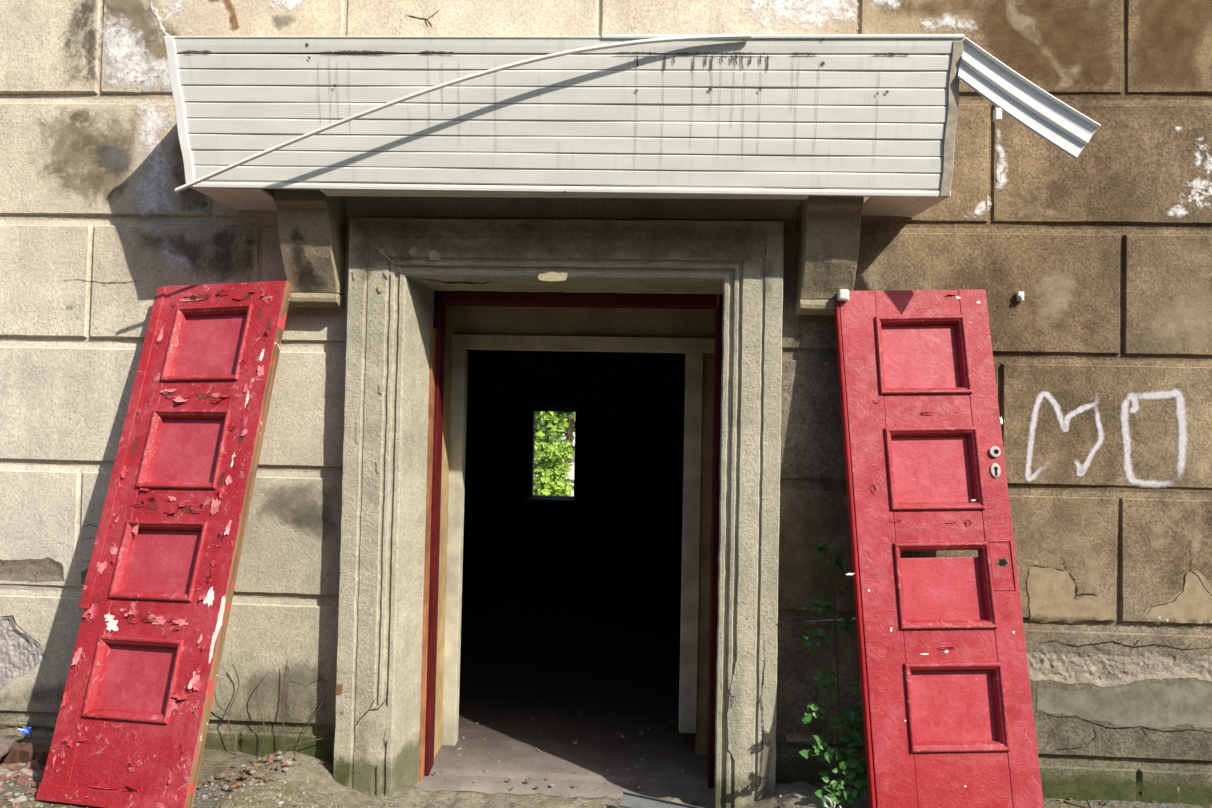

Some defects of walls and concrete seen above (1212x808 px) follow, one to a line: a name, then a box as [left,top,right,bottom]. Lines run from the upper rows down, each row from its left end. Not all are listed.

leakage [43,0,253,278]
leakage [996,131,1007,188]
leakage [1166,138,1212,219]
leakage [965,200,992,217]
crack [375,245,493,286]
spalling [0,557,64,582]
peeling [1027,567,1117,623]
peeling [1137,570,1212,625]
spalling [0,616,47,691]
spalling [1026,645,1212,687]
crack [354,687,390,751]
crack [725,634,765,788]